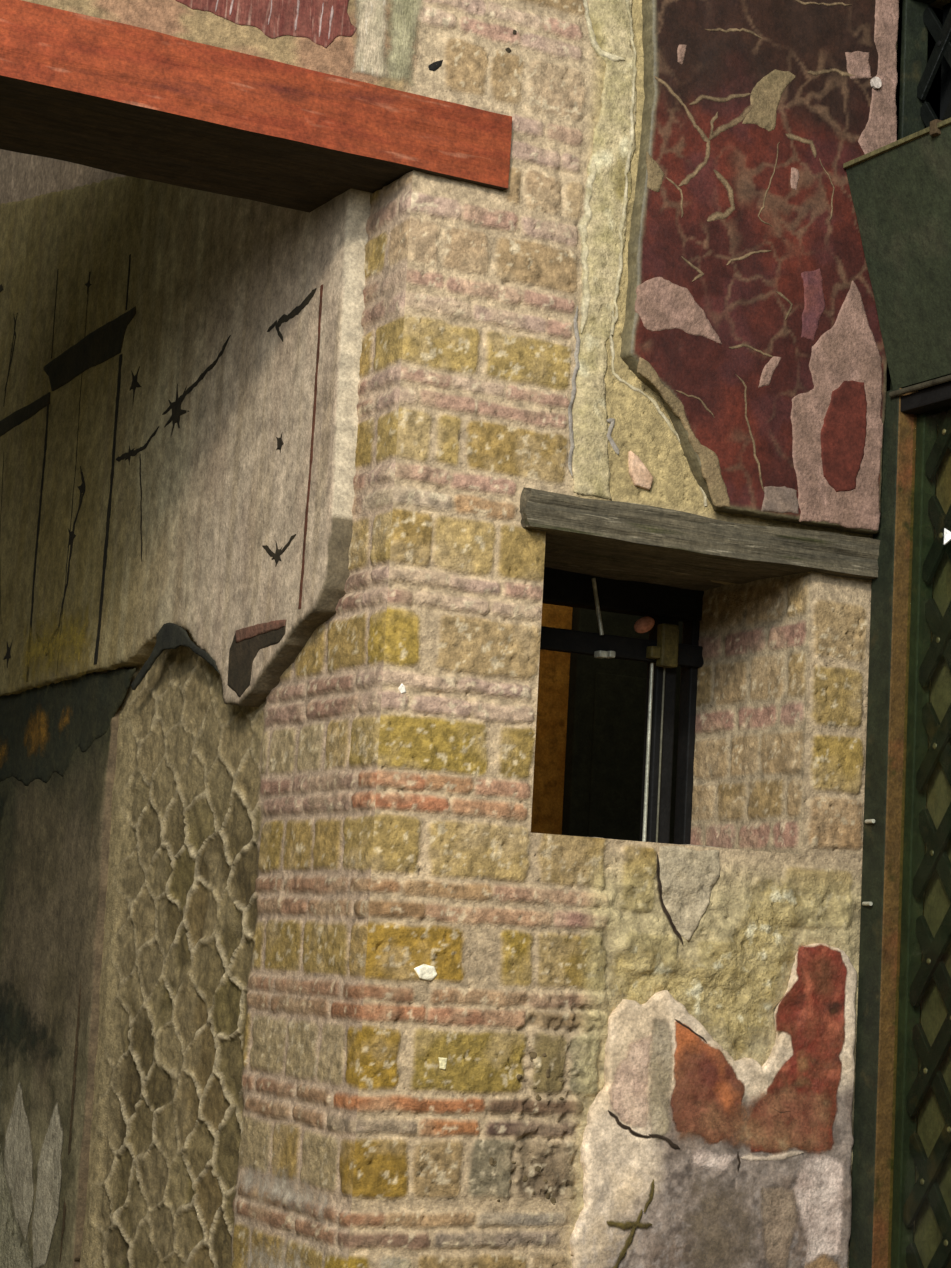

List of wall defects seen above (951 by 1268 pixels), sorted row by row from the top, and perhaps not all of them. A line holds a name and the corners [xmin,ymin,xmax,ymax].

crack [654,76,835,282]
peeling [620,0,899,535]
crack [267,288,316,342]
crack [116,335,231,562]
crack [729,344,773,491]
crack [262,534,296,559]
spalling [131,620,286,697]
crack [656,854,683,944]
crack [675,1019,706,1042]
peeling [570,880,857,1268]
crack [608,1110,680,1149]
crack [607,1179,654,1268]